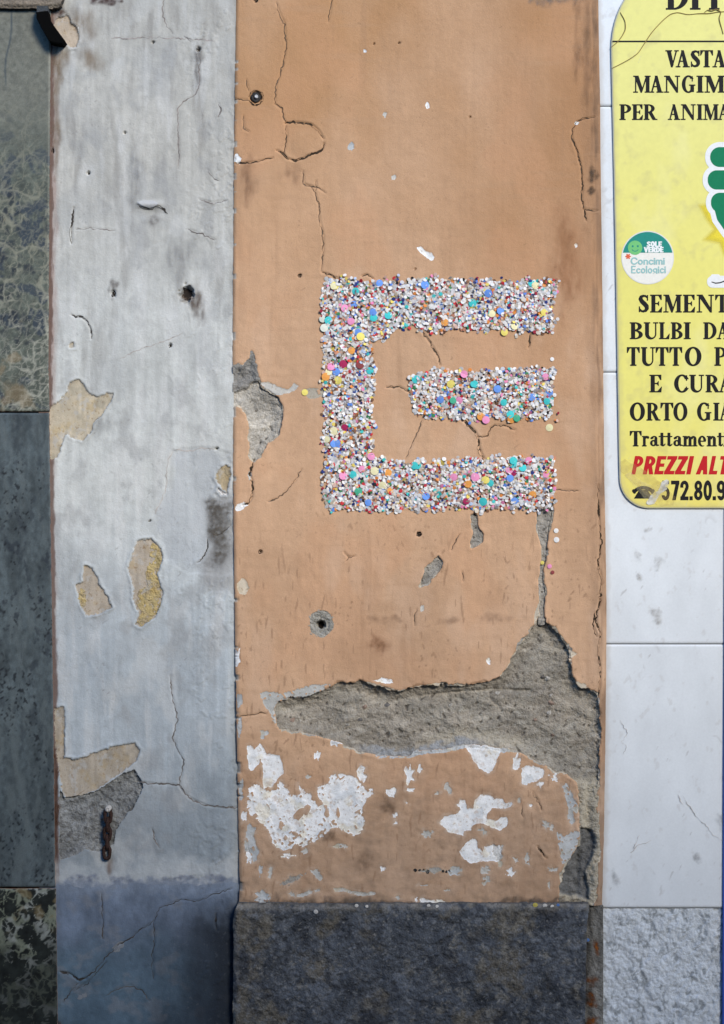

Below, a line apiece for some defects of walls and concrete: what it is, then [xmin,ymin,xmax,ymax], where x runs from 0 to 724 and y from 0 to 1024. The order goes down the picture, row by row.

crack [202,4,338,279]
crack [571,117,594,219]
peeling [49,379,113,460]
peeling [216,465,231,495]
flaking render [233,350,324,480]
crack [461,418,512,458]
peeling [76,565,111,616]
peeling [128,539,163,627]
flaking render [54,706,143,859]
crack [138,678,237,809]
flaking render [237,503,602,906]
crack [60,890,227,1001]